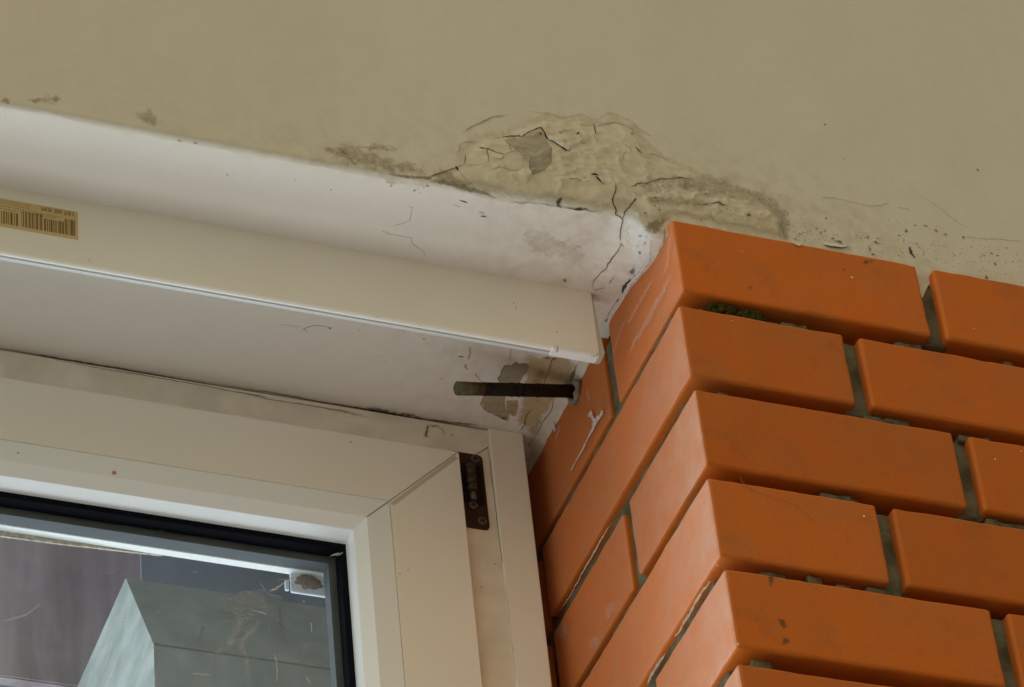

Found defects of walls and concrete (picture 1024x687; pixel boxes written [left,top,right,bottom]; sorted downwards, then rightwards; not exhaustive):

flaking render [505,129,552,175]
crack [585,173,693,290]
leakage [606,197,671,324]
flaking render [498,362,528,383]
flaking render [481,396,517,420]